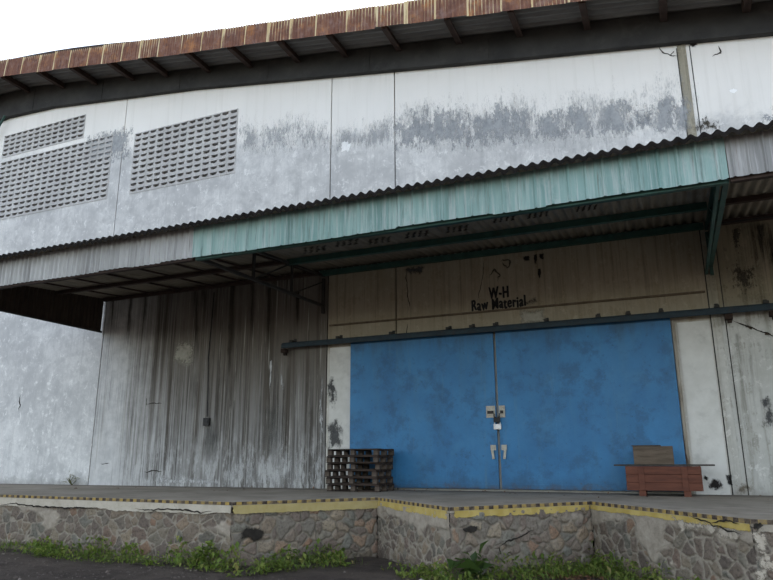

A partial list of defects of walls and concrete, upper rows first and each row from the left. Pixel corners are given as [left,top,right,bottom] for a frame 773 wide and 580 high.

water stain [320,377,341,449]
water stain [763,396,773,426]
water stain [704,475,749,491]